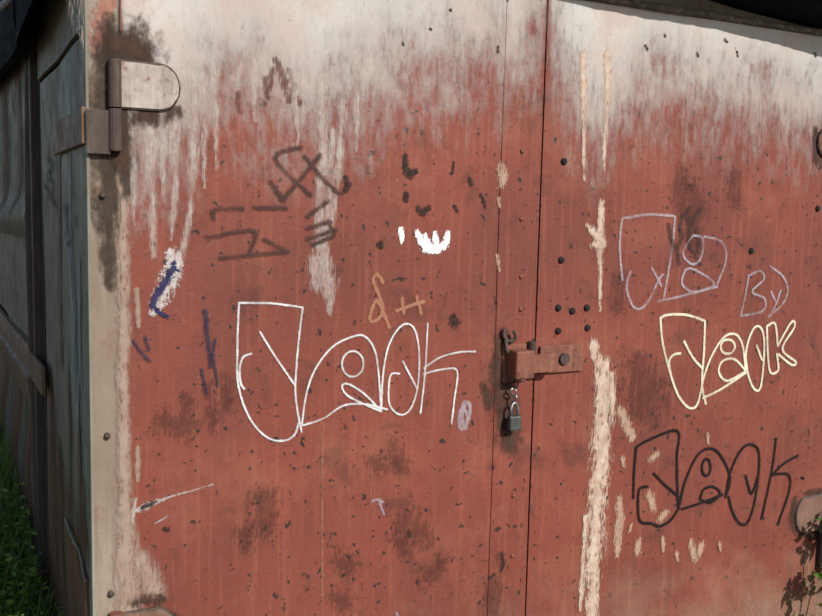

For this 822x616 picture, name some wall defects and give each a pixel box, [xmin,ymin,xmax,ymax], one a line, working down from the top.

rust [102,29,153,62]
rust [113,106,183,172]
peeling [585,199,606,313]
peeling [579,338,636,616]
peeling [646,488,668,523]
peeling [675,539,704,564]